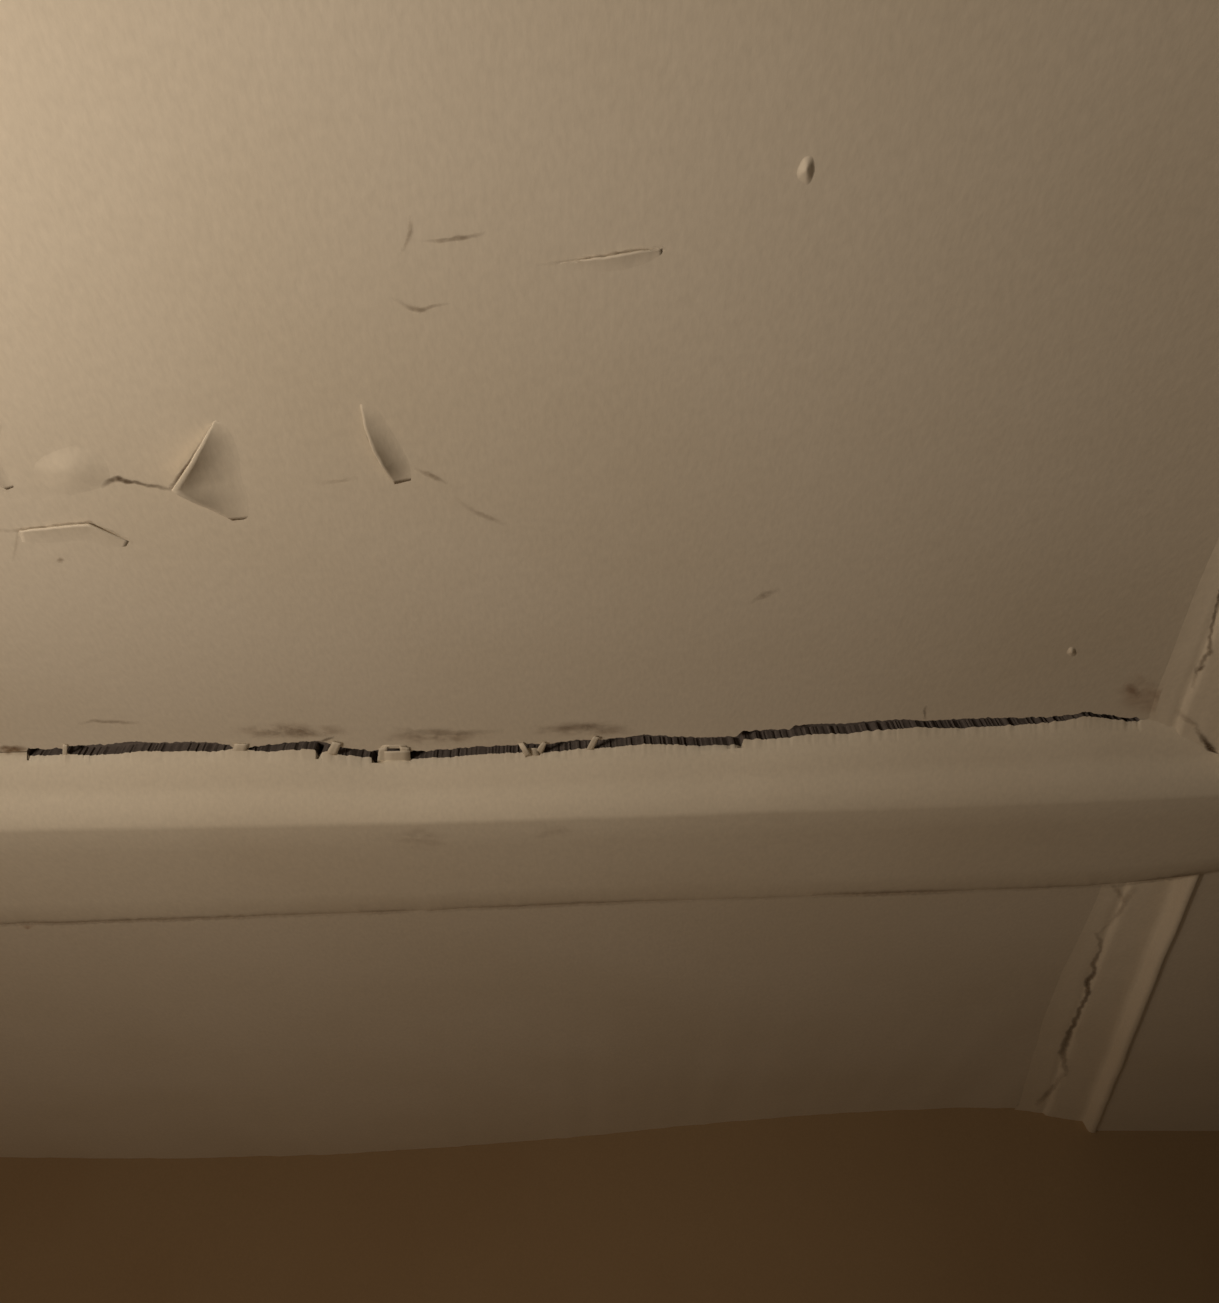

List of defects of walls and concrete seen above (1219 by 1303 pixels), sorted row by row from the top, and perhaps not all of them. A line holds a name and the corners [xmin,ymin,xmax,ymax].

crack [561,249,662,272]
peeling [172,421,249,521]
peeling [360,404,411,484]
crack [2,712,1140,763]
crack [1064,971,1095,1045]